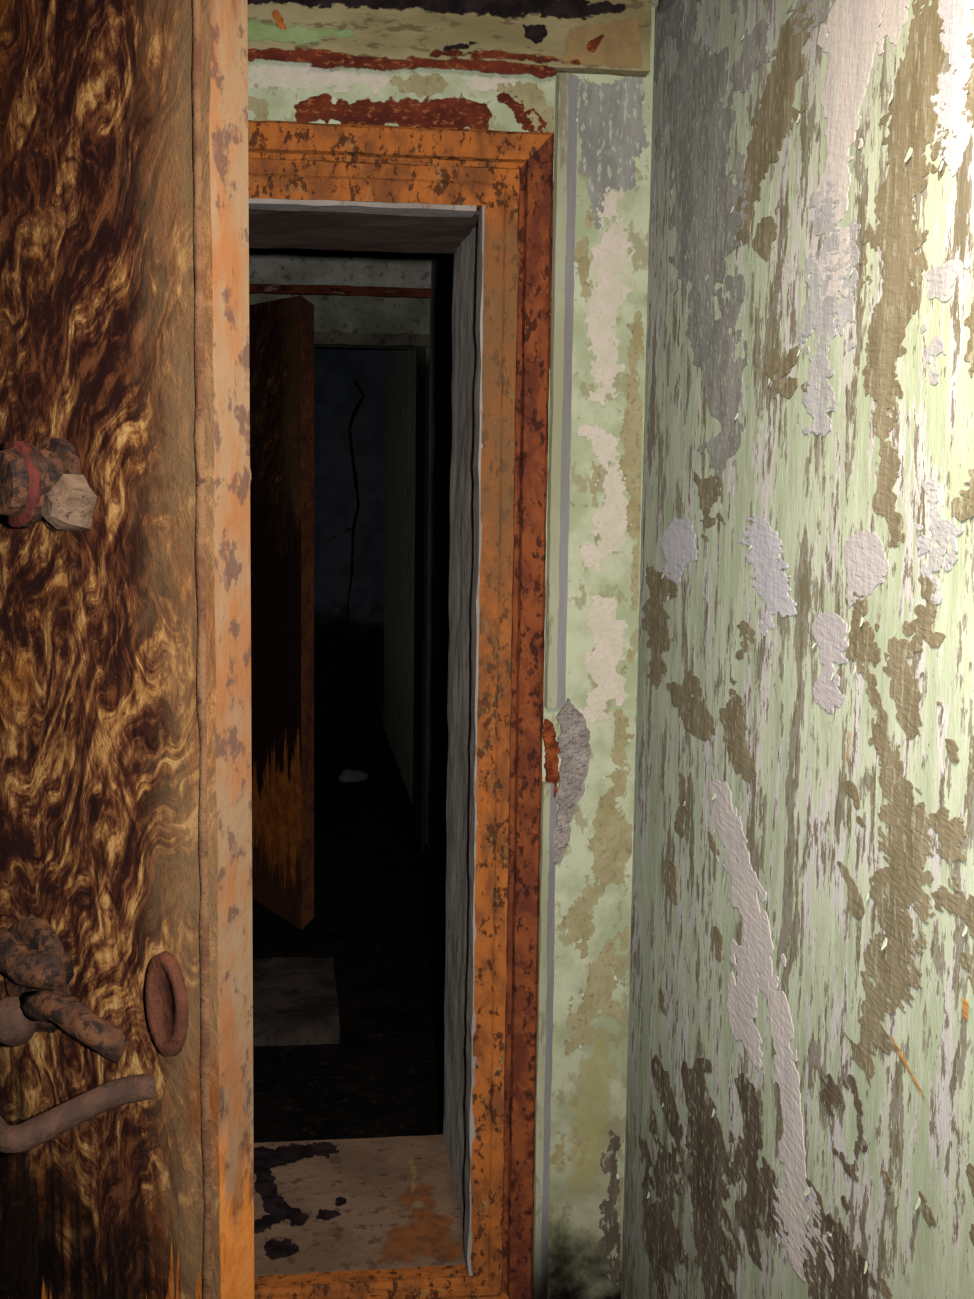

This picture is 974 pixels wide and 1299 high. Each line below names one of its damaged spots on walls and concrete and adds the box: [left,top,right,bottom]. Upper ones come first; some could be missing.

peeling [542,0,974,1299]